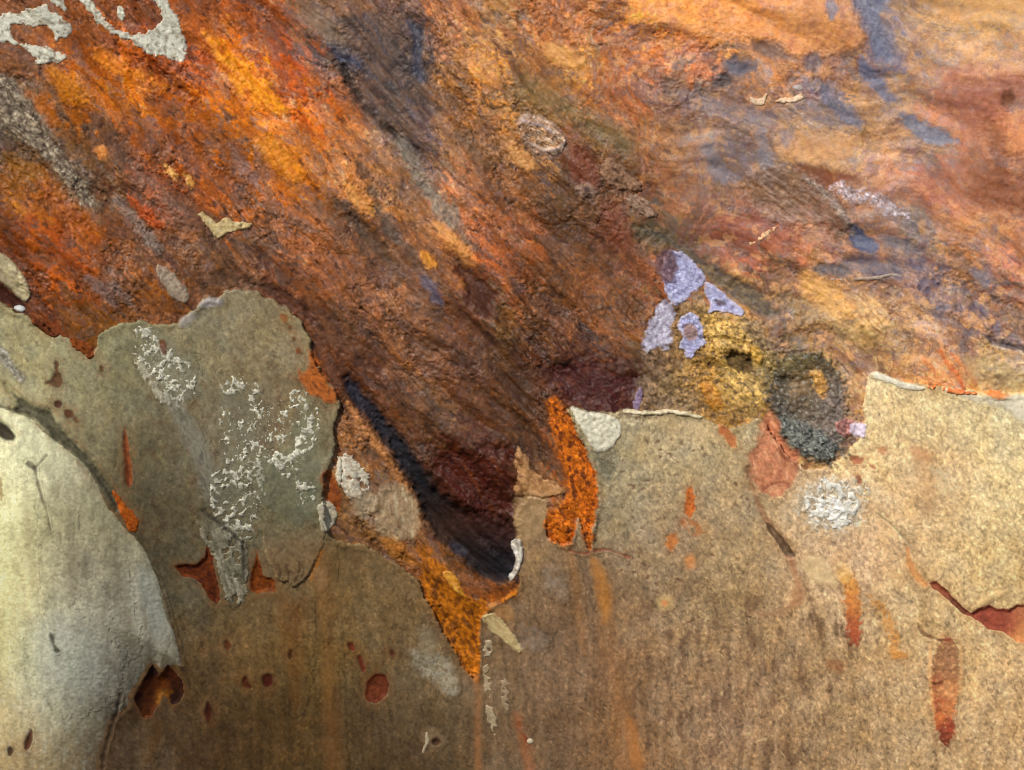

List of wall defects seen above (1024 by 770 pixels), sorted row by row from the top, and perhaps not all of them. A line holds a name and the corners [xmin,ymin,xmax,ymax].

peeling [0,0,73,65]
peeling [79,0,188,62]
corrosion [0,0,1024,532]
peeling [640,246,745,359]
peeling [132,264,425,606]
peeling [571,387,703,487]
leakage [629,297,876,543]
corrosion [328,470,523,770]
corrosion [663,483,708,574]
corrosion [835,563,910,661]
crack [875,511,1024,644]
corrosion [925,638,965,748]